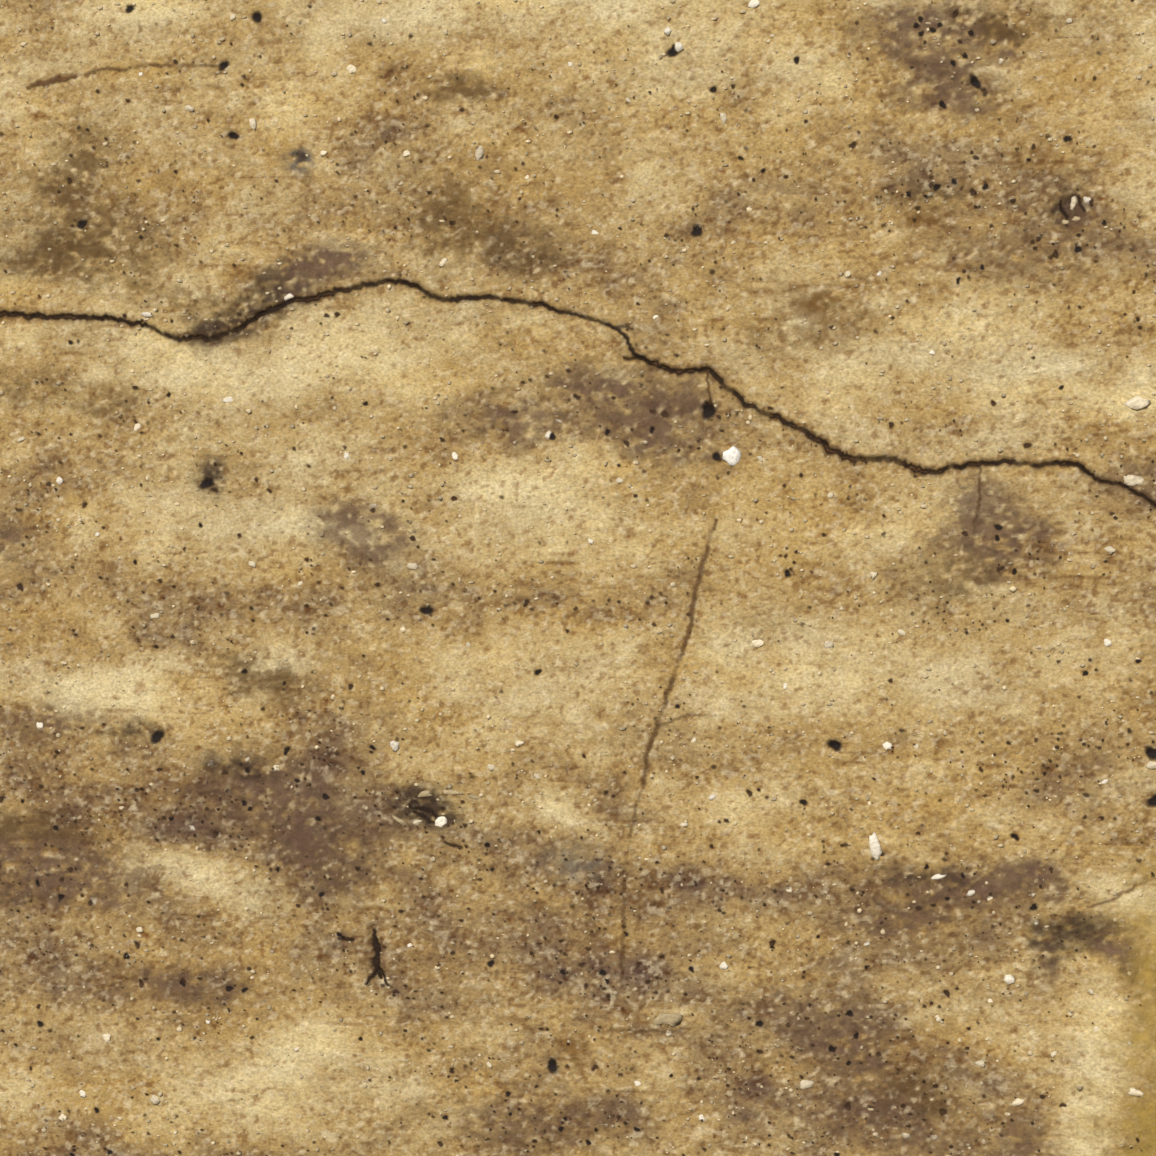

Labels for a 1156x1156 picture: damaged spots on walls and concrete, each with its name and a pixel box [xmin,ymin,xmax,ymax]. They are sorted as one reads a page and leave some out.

crack [0,279,1156,519]